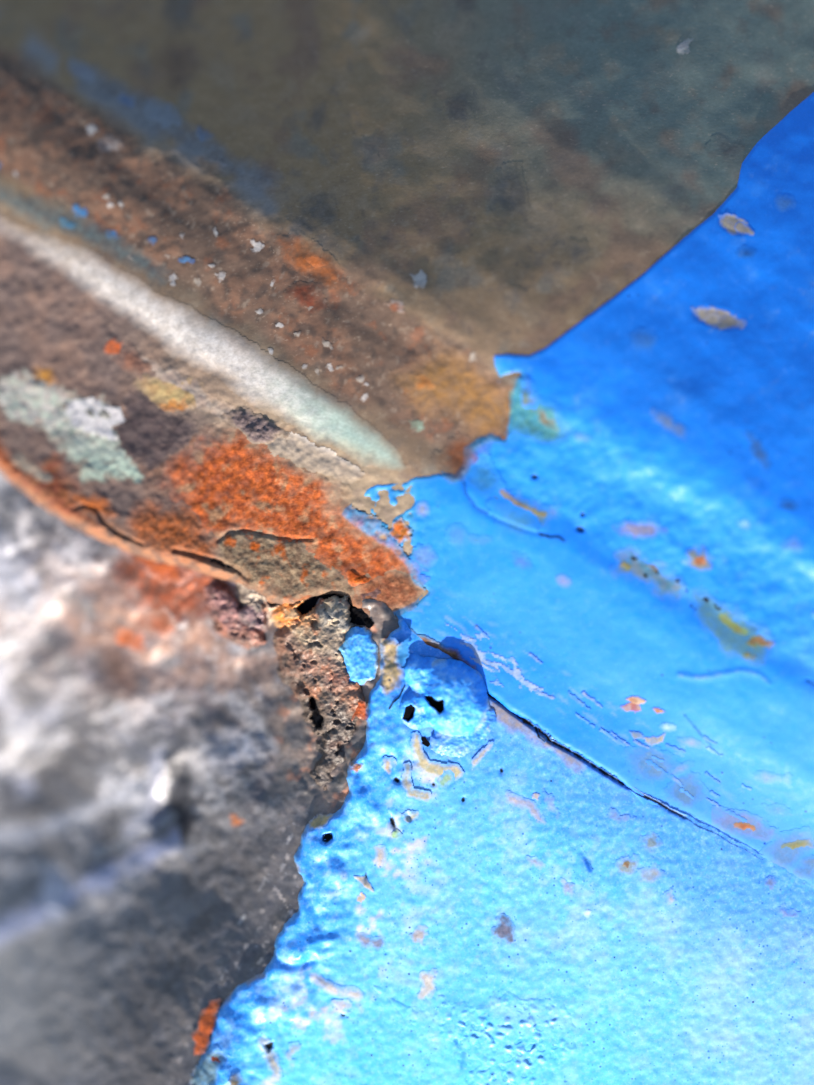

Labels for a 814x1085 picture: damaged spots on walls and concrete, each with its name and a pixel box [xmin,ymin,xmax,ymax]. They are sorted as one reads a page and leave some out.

peeling [0,162,407,486]
peeling [690,305,747,331]
crack [70,504,143,546]
rust [0,422,430,712]
crack [209,539,230,568]
spalling [297,594,374,629]
rust [608,544,778,669]
peeling [378,622,555,700]
rust [351,697,369,721]
peeling [353,731,494,903]
crack [487,693,763,860]
rust [189,998,244,1085]